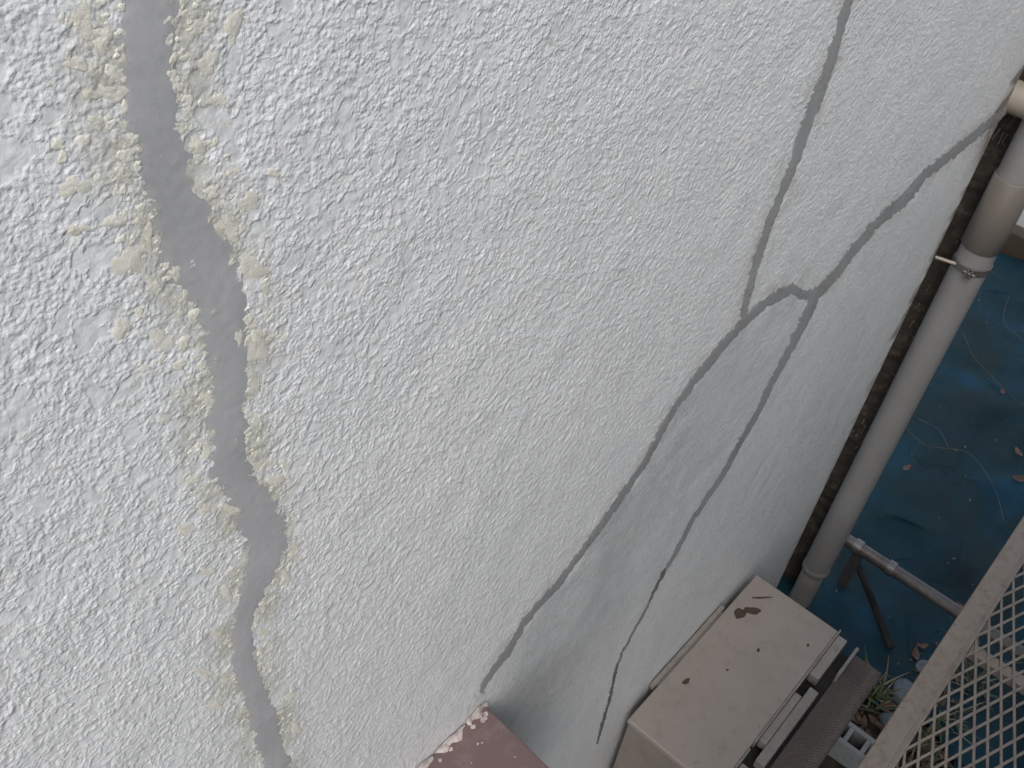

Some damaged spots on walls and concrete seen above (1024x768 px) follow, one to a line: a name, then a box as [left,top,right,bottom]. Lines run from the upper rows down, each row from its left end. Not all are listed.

crack [46,0,312,768]
crack [479,0,1008,744]